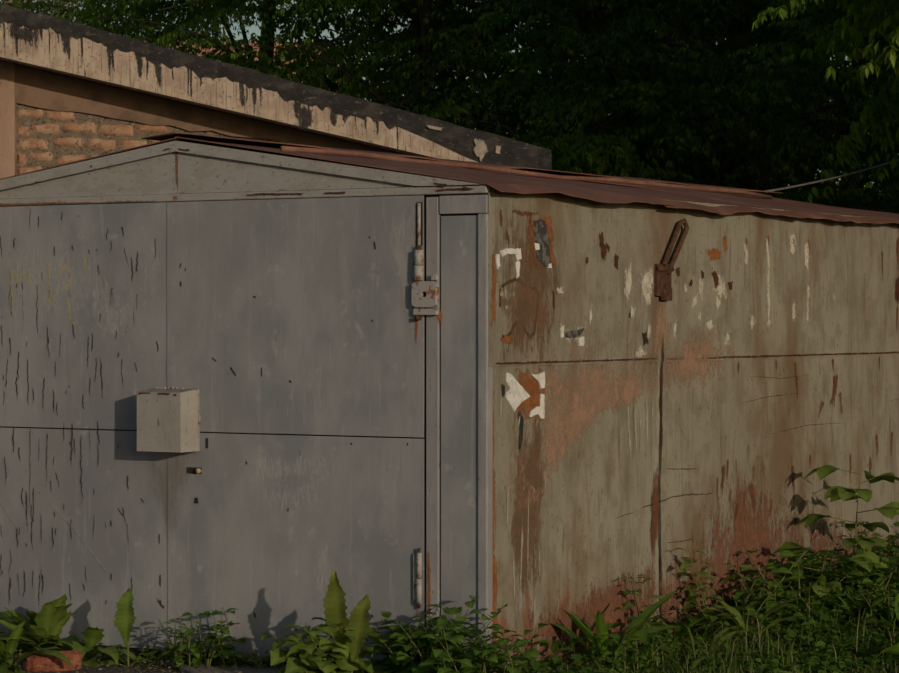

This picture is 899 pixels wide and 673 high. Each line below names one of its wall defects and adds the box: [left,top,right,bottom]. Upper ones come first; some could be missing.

corrosion [434,183,474,191]
peeling [624,262,655,319]
corrosion [492,209,899,418]
peeling [684,274,728,330]
peeling [510,339,674,595]
corrosion [493,409,898,669]